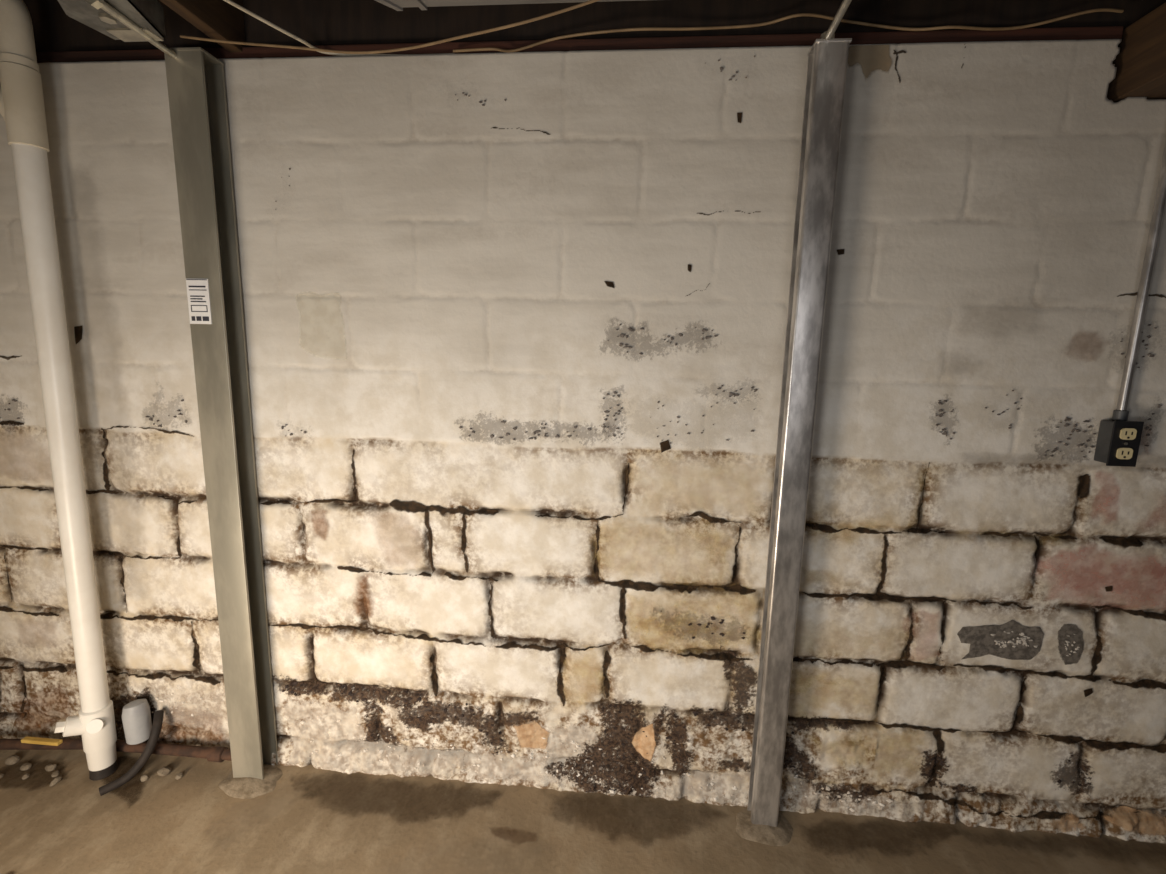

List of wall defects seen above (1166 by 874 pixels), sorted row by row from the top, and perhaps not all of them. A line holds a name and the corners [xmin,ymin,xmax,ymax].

peeling [848,45,892,78]
peeling [957,620,1044,660]
peeling [1058,624,1084,665]
leakage [110,687,207,743]
leakage [272,617,758,801]
leakage [0,761,64,789]
leakage [103,756,144,803]
leakage [304,775,500,820]
leakage [783,715,956,853]
leakage [918,750,984,796]
leakage [1051,752,1093,798]